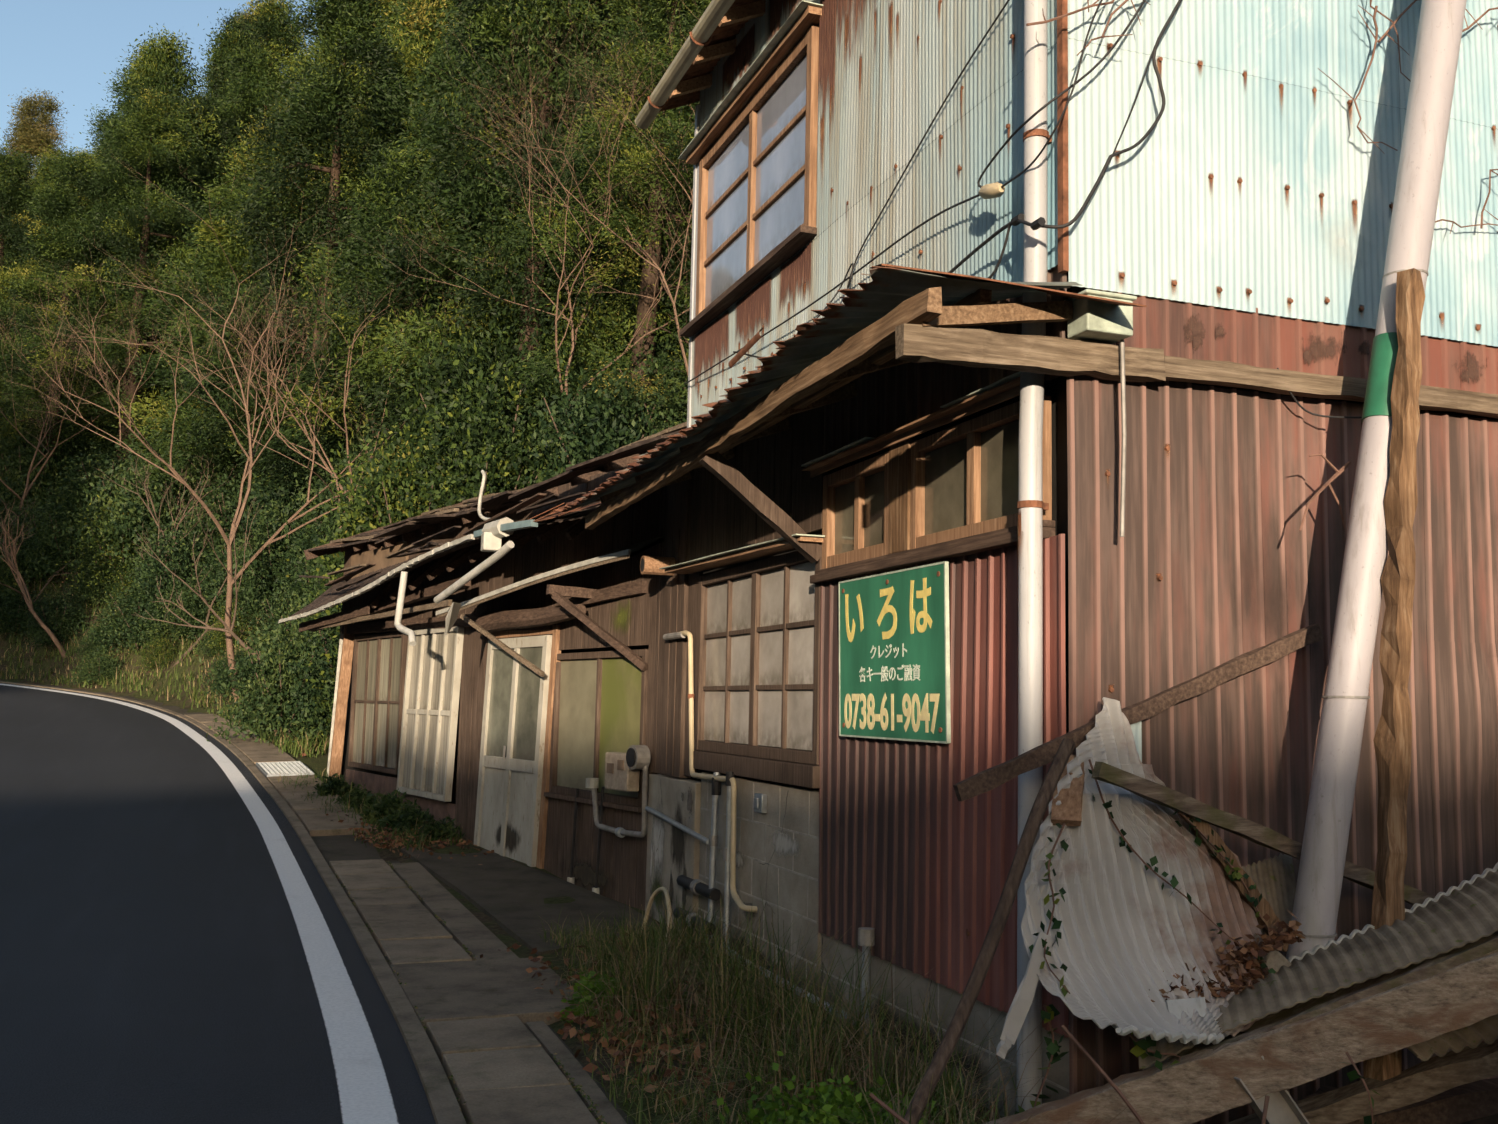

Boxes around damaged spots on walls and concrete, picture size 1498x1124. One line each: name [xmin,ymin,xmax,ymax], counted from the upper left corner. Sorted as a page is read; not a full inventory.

corrosion [722,0,802,97]
corrosion [818,0,899,161]
corrosion [694,242,811,401]
damp [496,824,519,852]